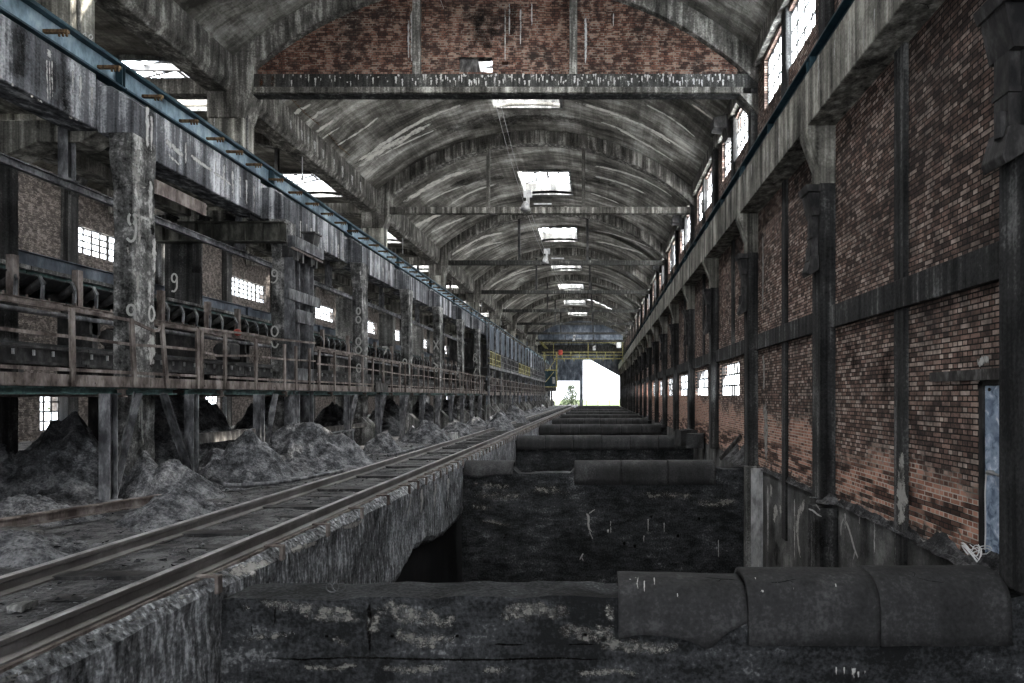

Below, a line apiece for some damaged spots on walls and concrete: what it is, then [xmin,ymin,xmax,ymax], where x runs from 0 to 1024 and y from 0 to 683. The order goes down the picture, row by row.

damp [72,71,93,109]
damp [145,106,153,157]
damp [166,140,255,203]
damp [148,239,157,302]
damp [147,334,156,364]
damp [896,453,909,524]
spalling [0,405,578,683]
spalling [503,602,678,654]
damp [305,663,356,671]
damp [385,665,442,674]
damp [581,668,634,676]